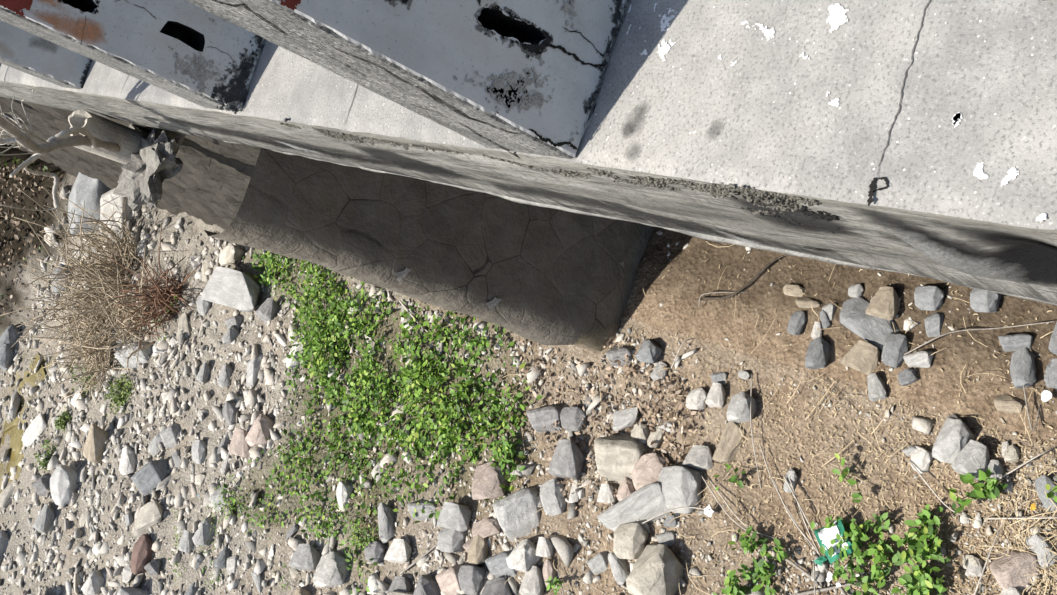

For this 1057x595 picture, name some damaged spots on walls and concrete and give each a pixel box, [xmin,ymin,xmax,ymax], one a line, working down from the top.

rust [40,0,101,40]
peeling [454,2,556,118]
crack [549,27,606,68]
crack [867,0,930,206]
damp [493,184,821,256]
damp [734,199,855,236]
damp [863,212,1057,256]